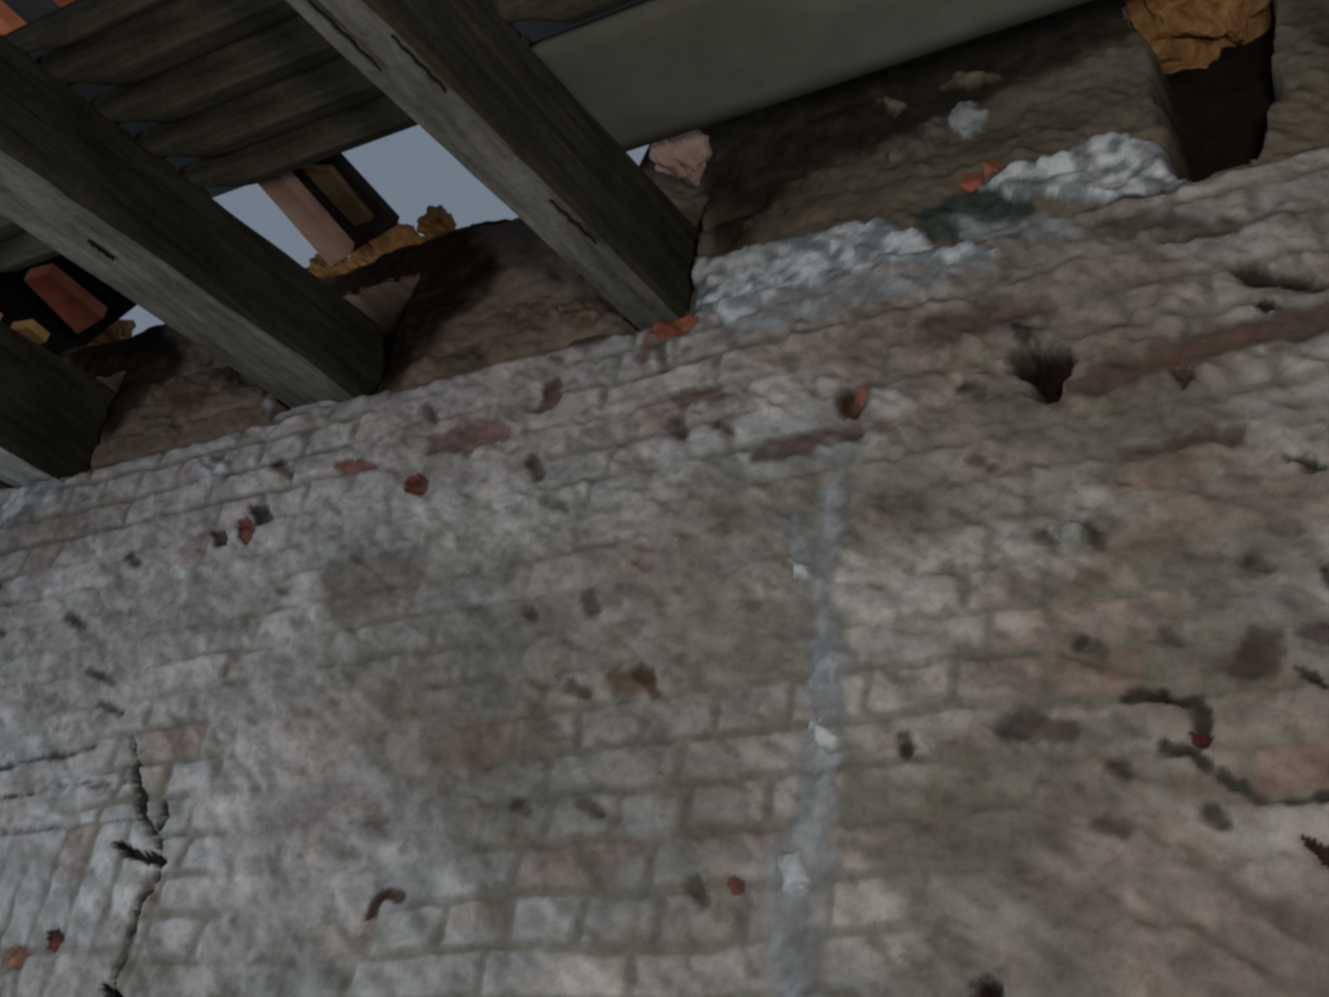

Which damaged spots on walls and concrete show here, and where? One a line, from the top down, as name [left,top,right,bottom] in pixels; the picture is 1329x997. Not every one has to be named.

crack [0,737,170,997]